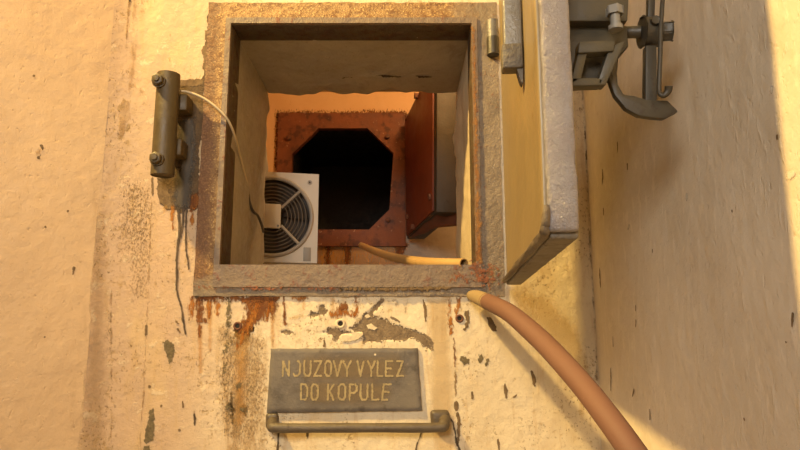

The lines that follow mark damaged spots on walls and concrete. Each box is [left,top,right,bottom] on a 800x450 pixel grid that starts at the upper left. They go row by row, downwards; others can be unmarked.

leakage [174,119,197,335]
rust [188,27,500,349]
peeling [143,405,162,450]
peeling [163,340,175,364]
leakage [221,325,264,438]
peeling [323,298,433,351]